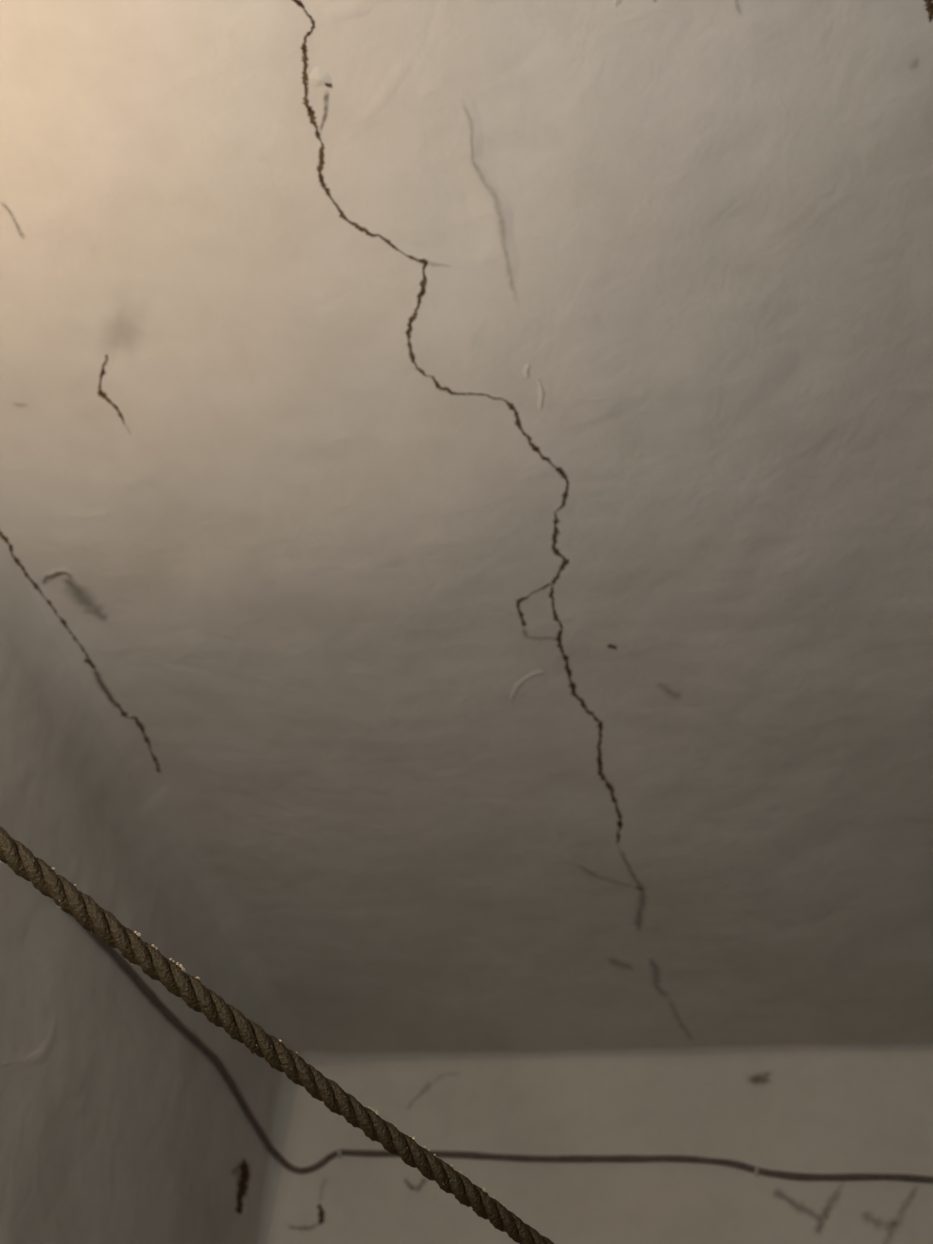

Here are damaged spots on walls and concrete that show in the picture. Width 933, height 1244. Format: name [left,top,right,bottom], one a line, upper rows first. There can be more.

crack [97,354,125,425]
crack [292,0,623,844]
crack [0,531,161,773]